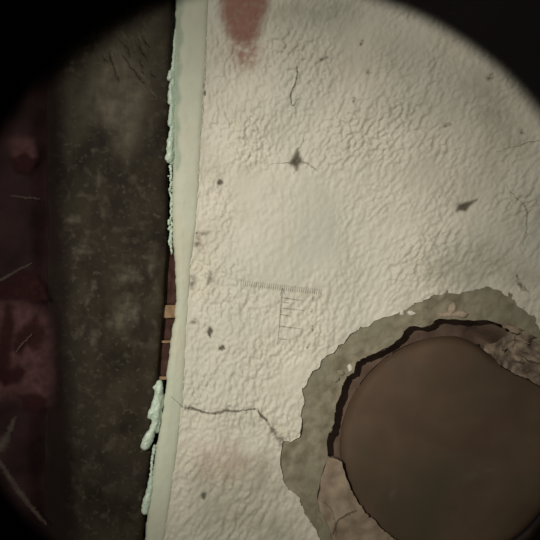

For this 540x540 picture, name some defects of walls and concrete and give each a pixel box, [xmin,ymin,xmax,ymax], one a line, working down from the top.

water stain [224,0,266,41]
crack [185,407,282,440]
spalling [280,286,540,540]